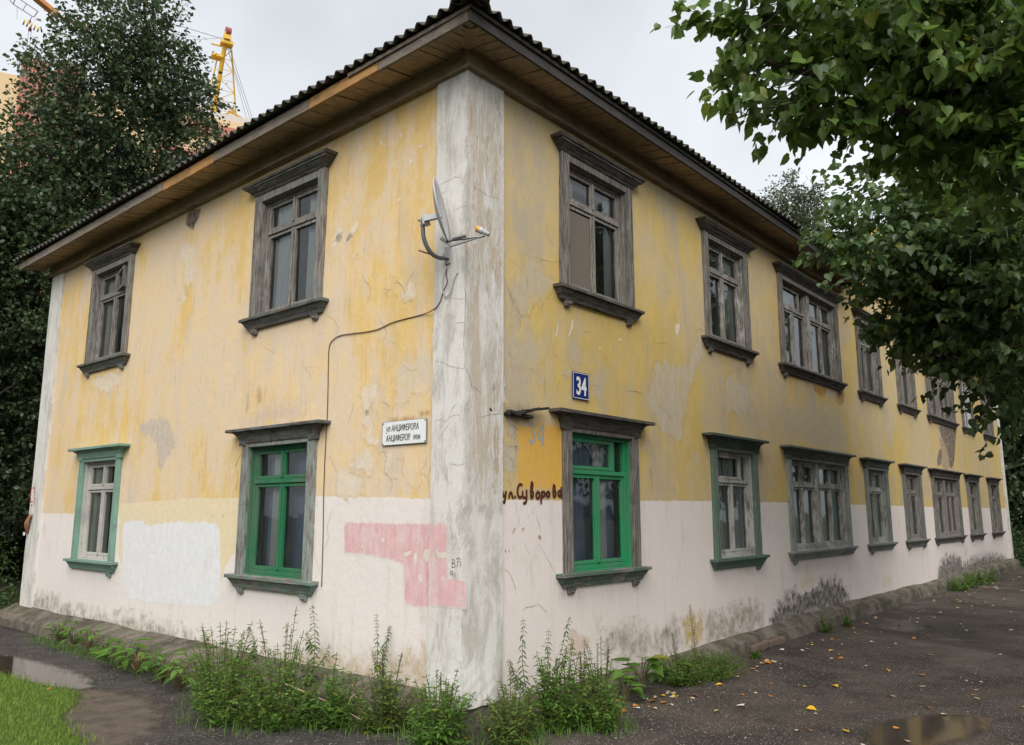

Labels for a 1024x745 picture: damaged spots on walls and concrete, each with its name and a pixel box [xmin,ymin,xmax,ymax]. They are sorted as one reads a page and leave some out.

peeling [645,337,704,444]
peeling [139,416,175,472]
leakage [936,550,1008,579]
leakage [700,573,850,646]
leakage [598,612,686,670]